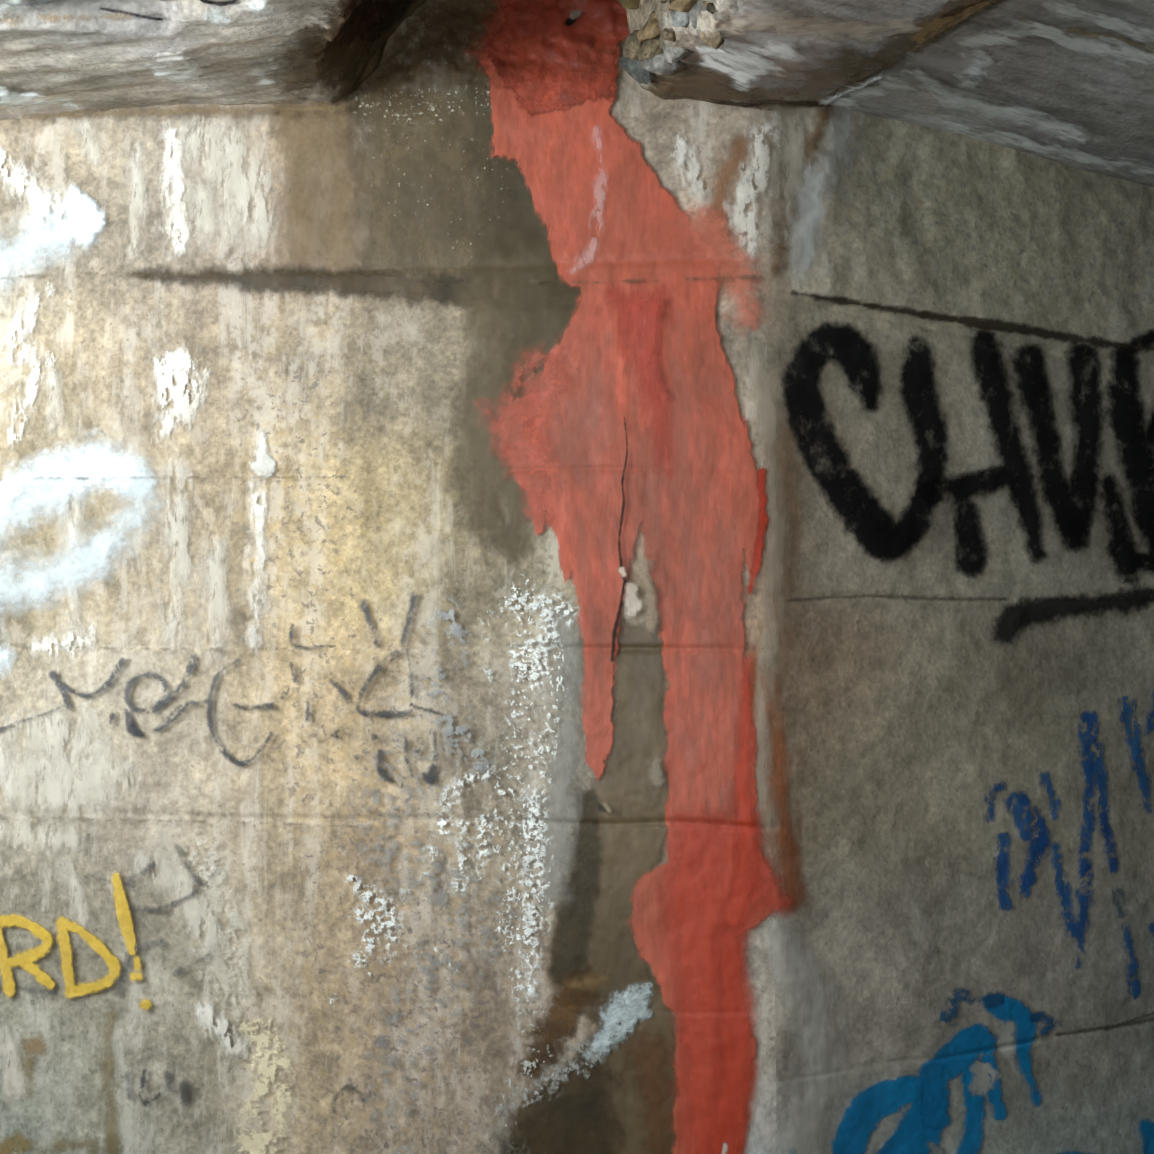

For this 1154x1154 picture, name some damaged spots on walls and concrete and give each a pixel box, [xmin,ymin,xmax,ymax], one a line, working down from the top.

crack [100,0,165,21]
crack [200,0,237,8]
spalling [617,0,724,84]
crack [611,418,628,662]